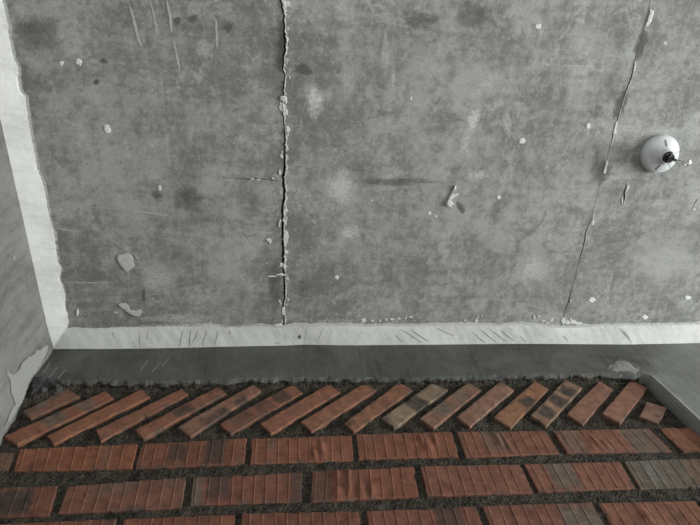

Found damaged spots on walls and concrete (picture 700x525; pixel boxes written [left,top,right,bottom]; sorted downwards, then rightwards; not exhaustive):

crack [235,0,291,327]